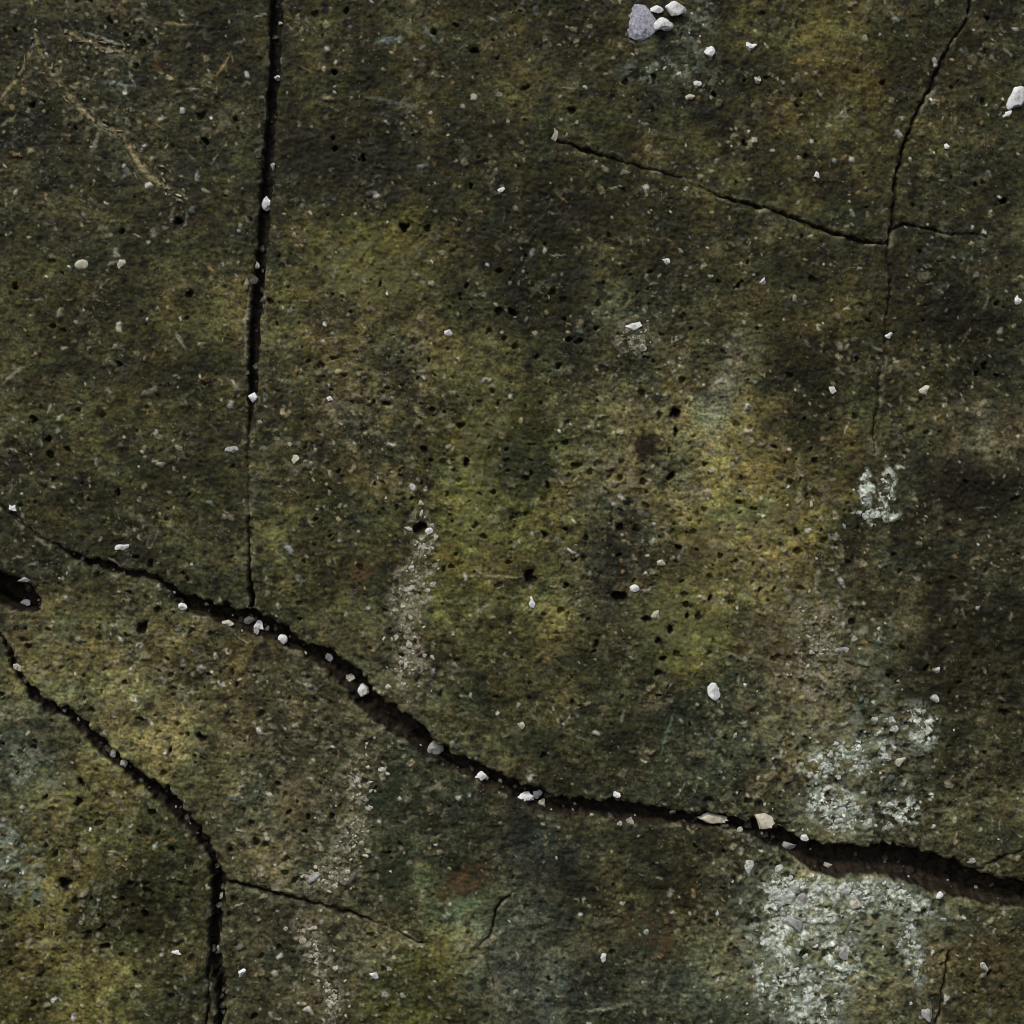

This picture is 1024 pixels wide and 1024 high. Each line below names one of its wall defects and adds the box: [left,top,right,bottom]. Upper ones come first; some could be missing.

crack [244,0,285,608]
crack [550,0,997,464]
efflorescence [852,455,899,526]
crack [0,631,435,1024]
crack [469,889,519,1001]
crack [0,503,1024,911]
leakage [744,860,754,876]
leakage [746,865,946,1024]
leakage [798,600,995,836]
crack [933,950,953,1024]